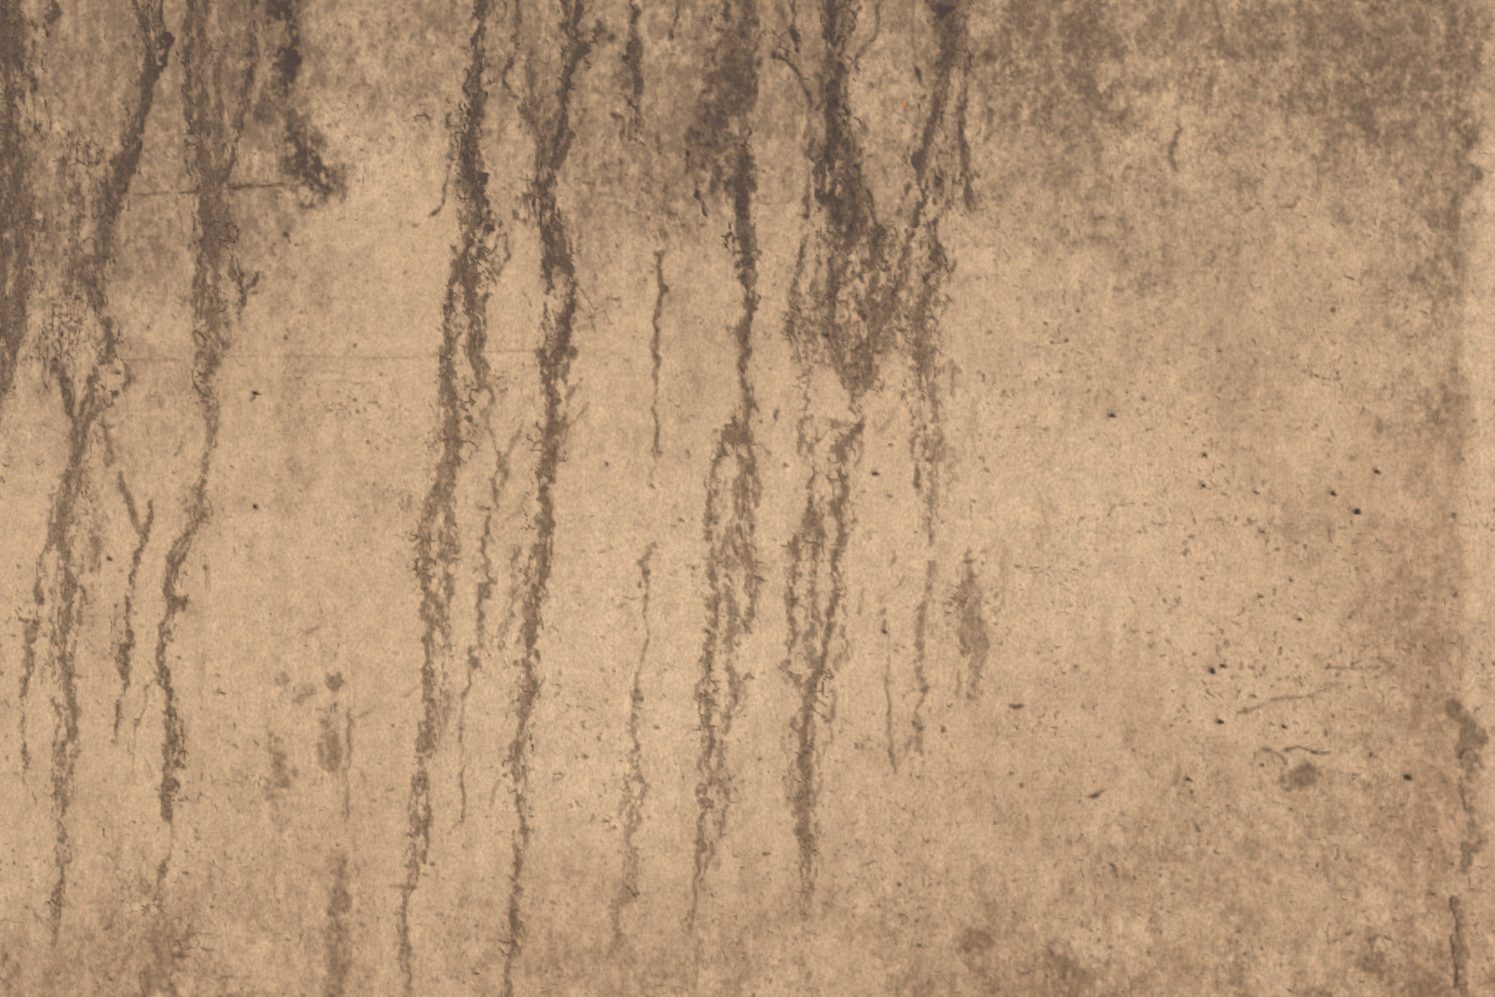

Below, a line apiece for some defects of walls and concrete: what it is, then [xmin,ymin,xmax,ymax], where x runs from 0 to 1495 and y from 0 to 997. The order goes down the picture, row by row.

leakage [0,0,302,930]
leakage [283,118,344,208]
leakage [411,0,661,997]
leakage [652,251,668,384]
leakage [684,0,988,871]